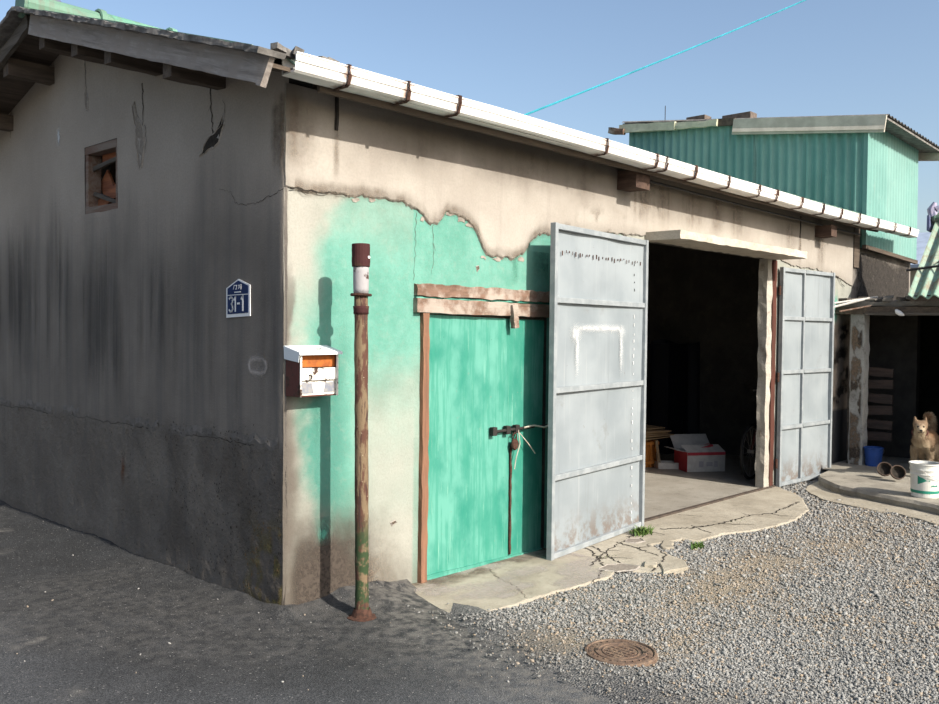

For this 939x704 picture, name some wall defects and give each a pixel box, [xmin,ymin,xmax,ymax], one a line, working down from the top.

crack [220,187,347,206]
peeling [296,186,551,272]
peeling [849,326,862,465]
leakage [295,534,355,605]
crack [585,502,800,584]